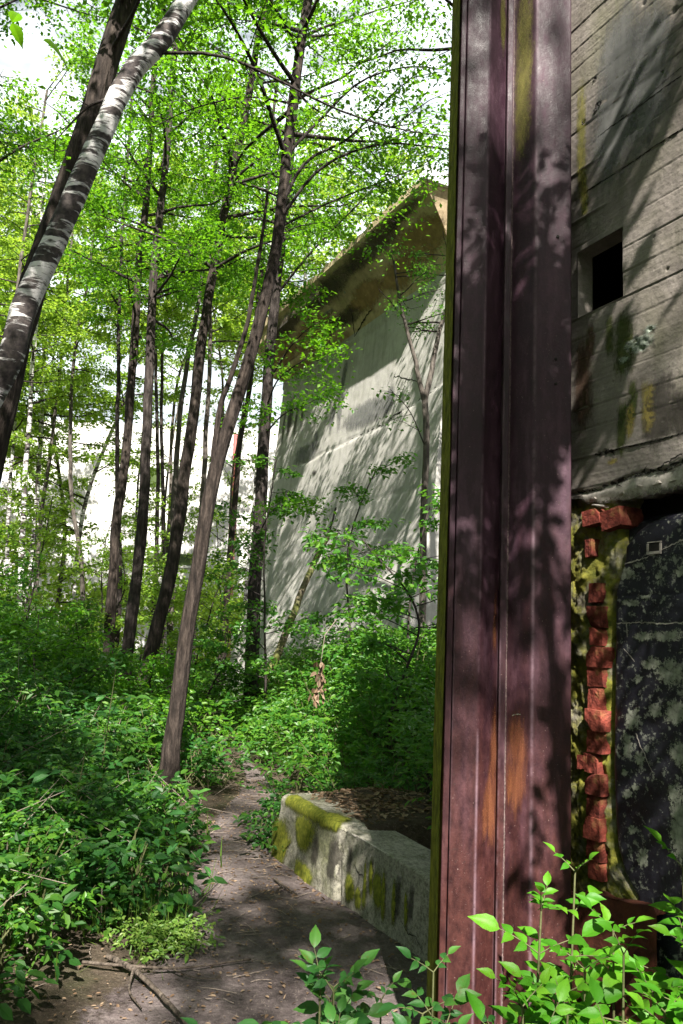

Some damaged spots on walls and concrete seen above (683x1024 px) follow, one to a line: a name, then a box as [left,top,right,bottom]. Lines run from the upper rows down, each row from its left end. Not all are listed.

leakage [574,314,683,464]
corrosion [484,721,495,829]
leakage [311,838,352,878]